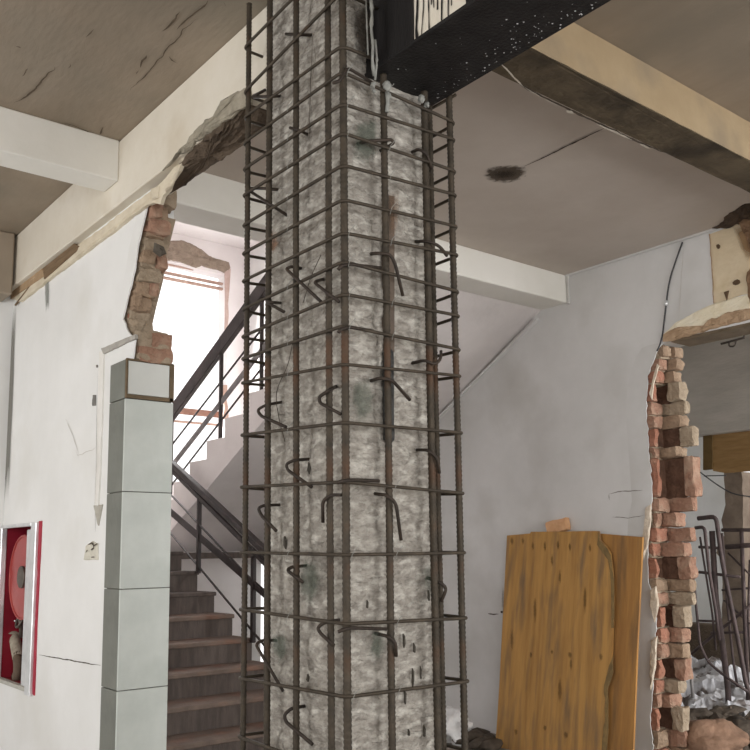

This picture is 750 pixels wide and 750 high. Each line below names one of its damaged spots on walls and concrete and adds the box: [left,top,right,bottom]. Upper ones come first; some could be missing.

crack [16,65,71,102]
crack [130,1,208,90]
crack [502,65,676,165]
water stain [486,166,524,182]
flaking render [12,87,267,365]
flaking render [626,203,750,750]
crack [42,655,101,666]